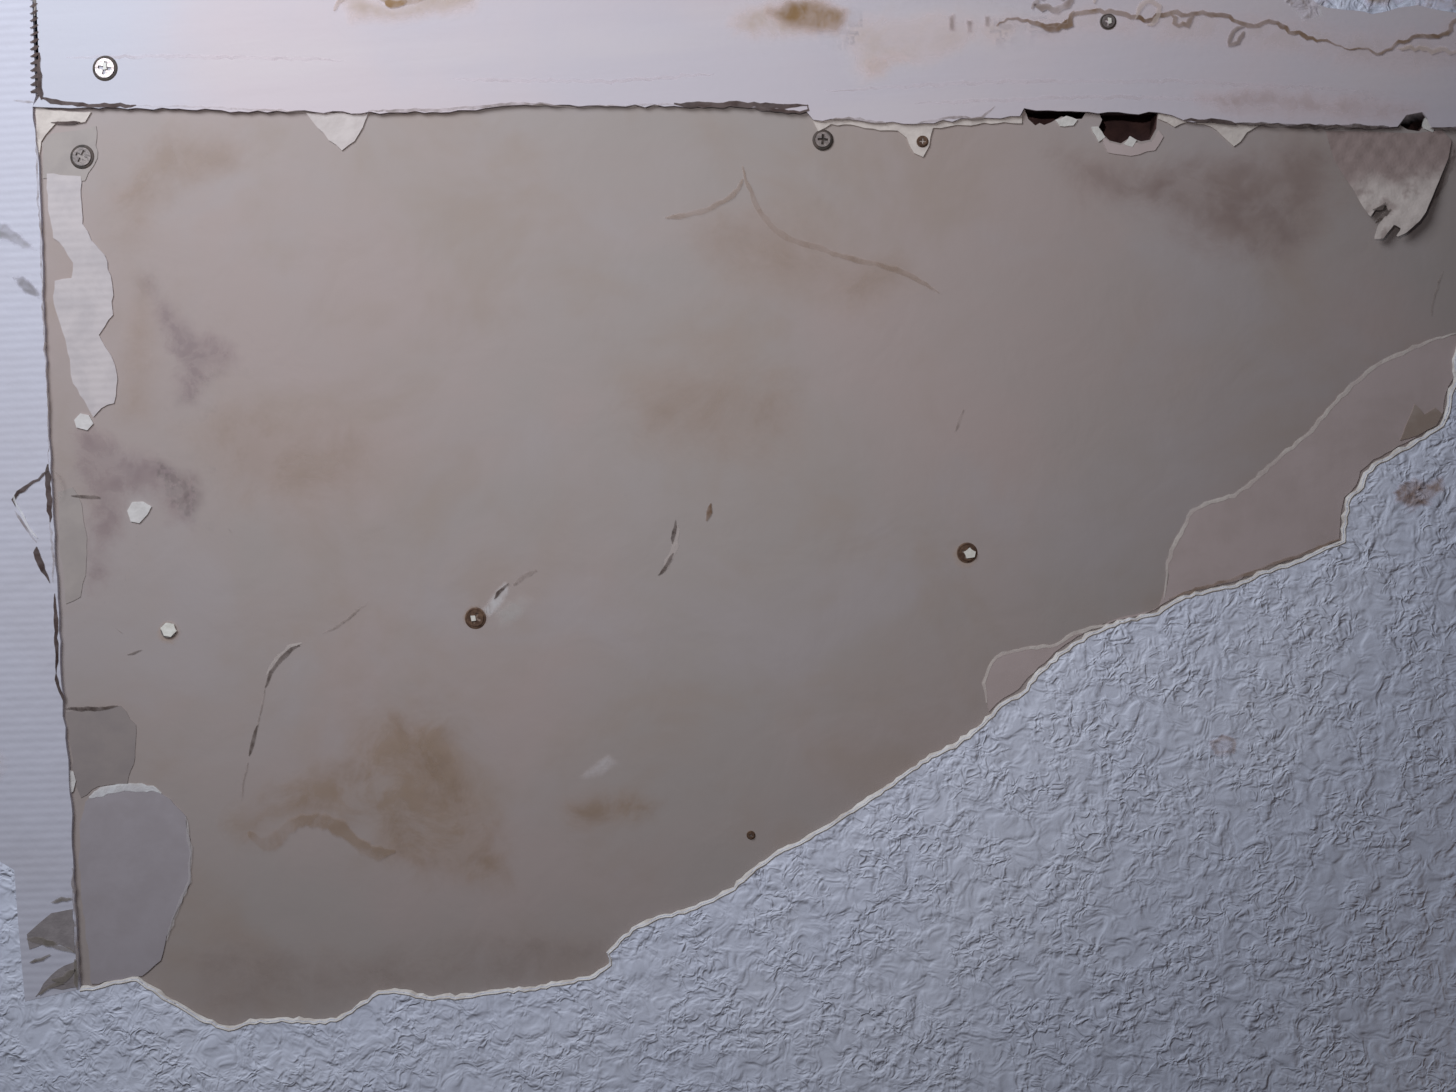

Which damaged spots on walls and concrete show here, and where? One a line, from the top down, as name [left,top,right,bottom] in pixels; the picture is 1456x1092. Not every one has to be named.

peeling [34,107,92,156]
peeling [42,126,98,181]
peeling [813,113,1022,157]
spalling [1026,110,1084,127]
spalling [1091,112,1157,147]
spalling [1401,113,1434,132]
peeling [1326,128,1452,239]
peeling [46,173,118,417]
crack [247,645,300,766]
peeling [67,335,1456,1032]
damp [295,723,456,857]
spalling [27,909,75,953]